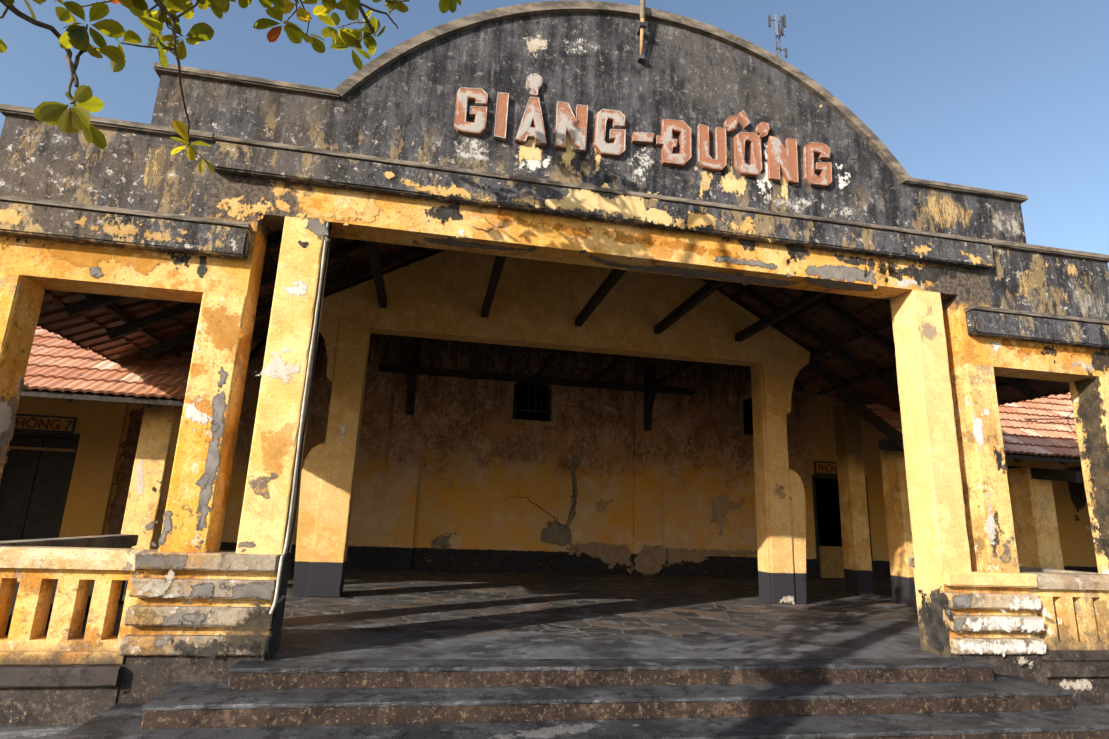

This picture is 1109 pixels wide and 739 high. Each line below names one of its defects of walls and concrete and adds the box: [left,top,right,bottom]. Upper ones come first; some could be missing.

damp [519,156,552,171]
damp [695,143,812,214]
damp [425,203,464,225]
peeling [512,183,771,243]
damp [834,254,981,296]
peeling [256,347,300,384]
flaking render [123,367,228,578]
spalling [249,473,278,499]
crack [507,456,580,550]
damp [1065,349,1109,560]
peeling [541,521,758,575]
flaking render [178,581,285,630]